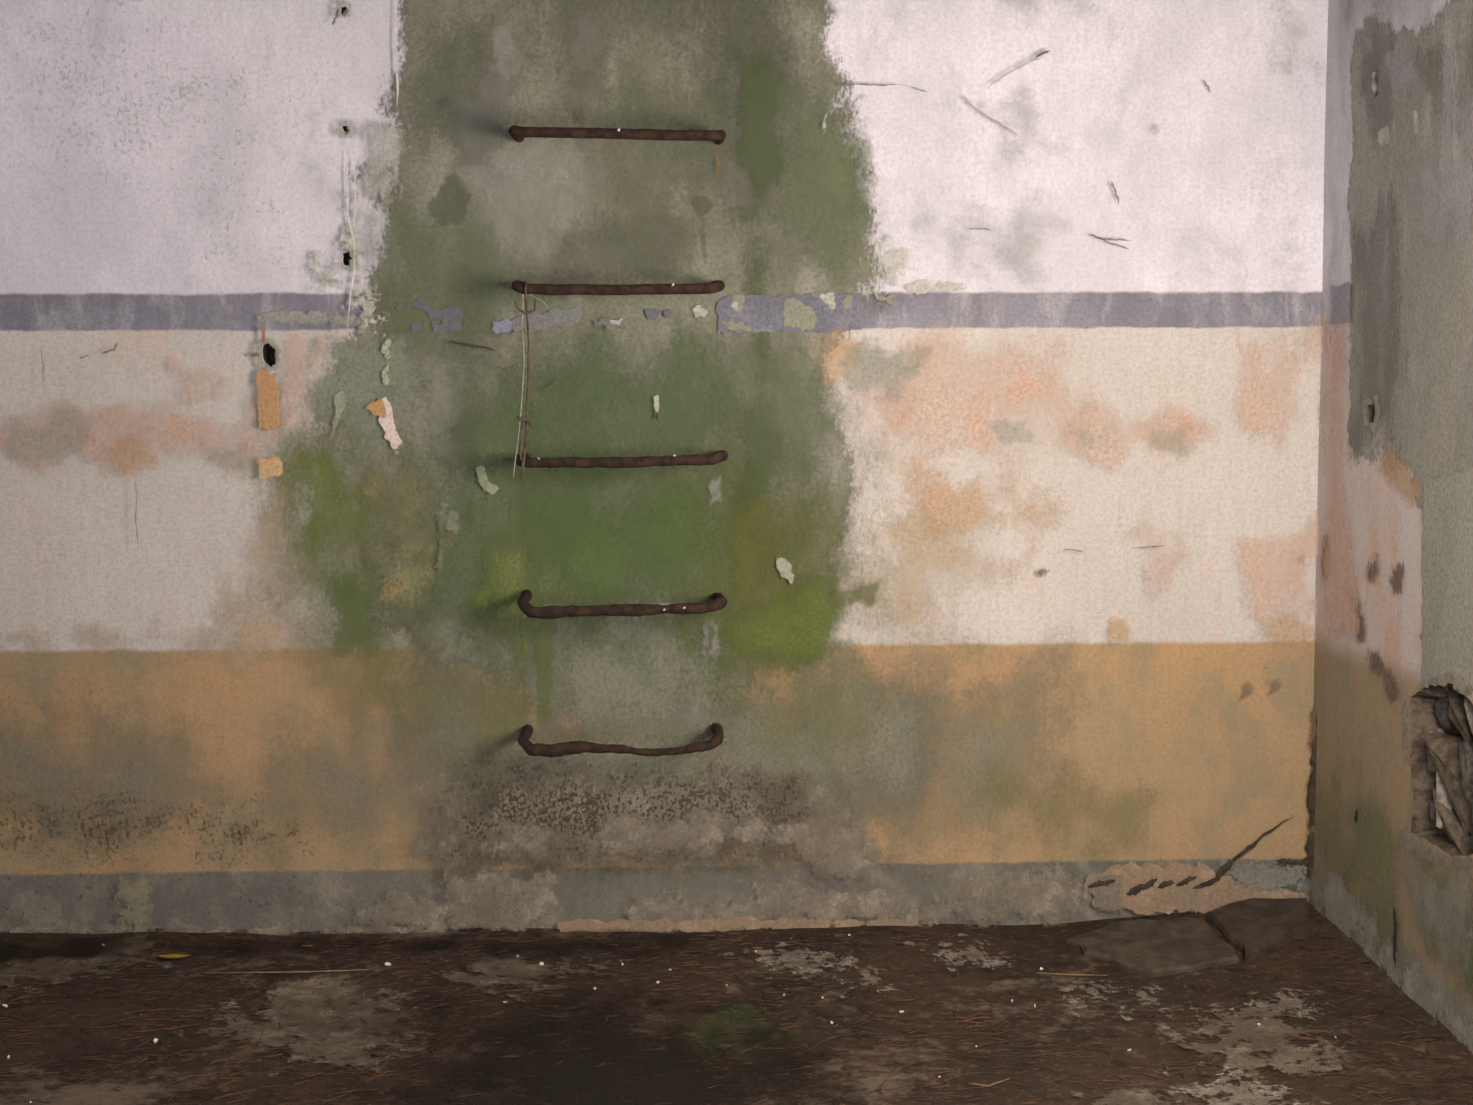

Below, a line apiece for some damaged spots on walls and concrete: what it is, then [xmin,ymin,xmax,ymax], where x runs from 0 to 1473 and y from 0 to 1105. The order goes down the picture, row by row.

leakage [1347,0,1473,510]
leakage [0,0,1046,883]
crack [1088,705,1317,896]
spalling [1399,672,1473,871]
crack [1391,908,1399,968]